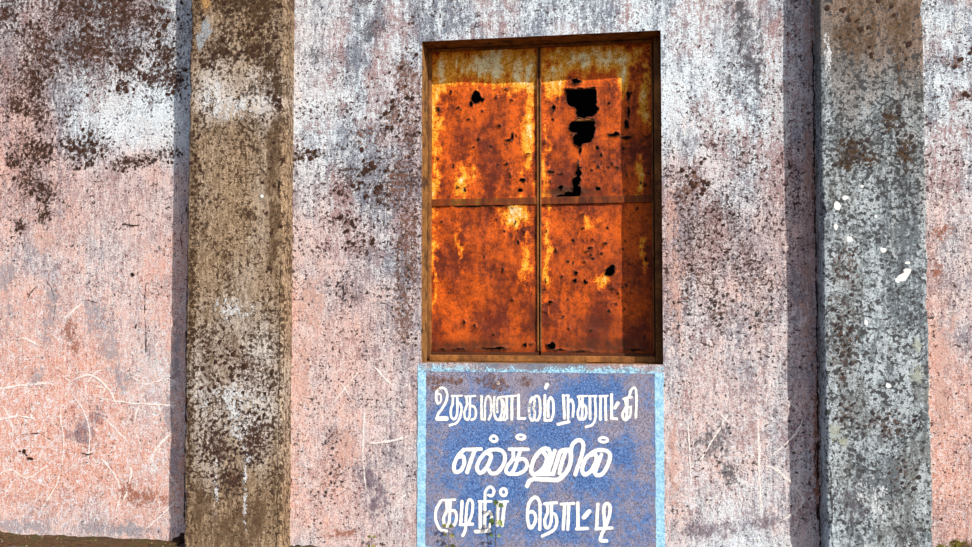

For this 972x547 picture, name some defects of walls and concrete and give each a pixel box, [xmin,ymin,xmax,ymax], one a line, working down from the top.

leakage [825,0,918,174]
leakage [0,0,325,547]
leakage [825,238,921,443]
leakage [813,376,821,509]
leakage [857,454,921,523]